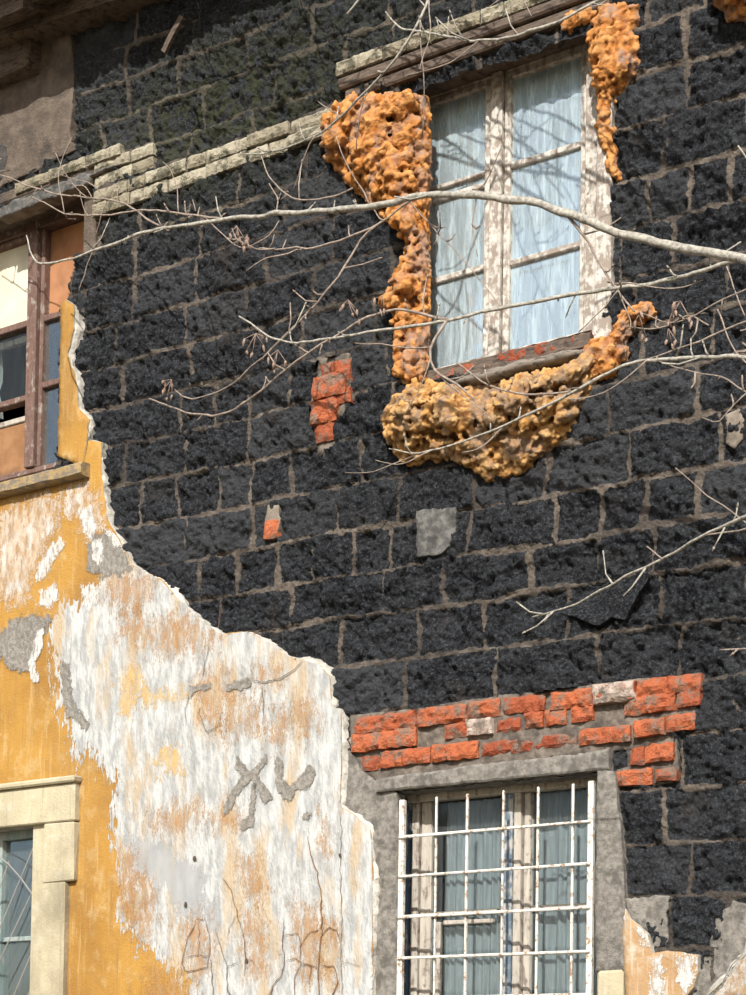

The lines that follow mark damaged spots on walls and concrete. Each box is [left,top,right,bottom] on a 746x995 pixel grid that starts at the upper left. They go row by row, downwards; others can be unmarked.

flaking render [99,141,367,247]
flaking render [0,0,593,194]
flaking render [610,0,746,254]
flaking render [0,210,746,995]